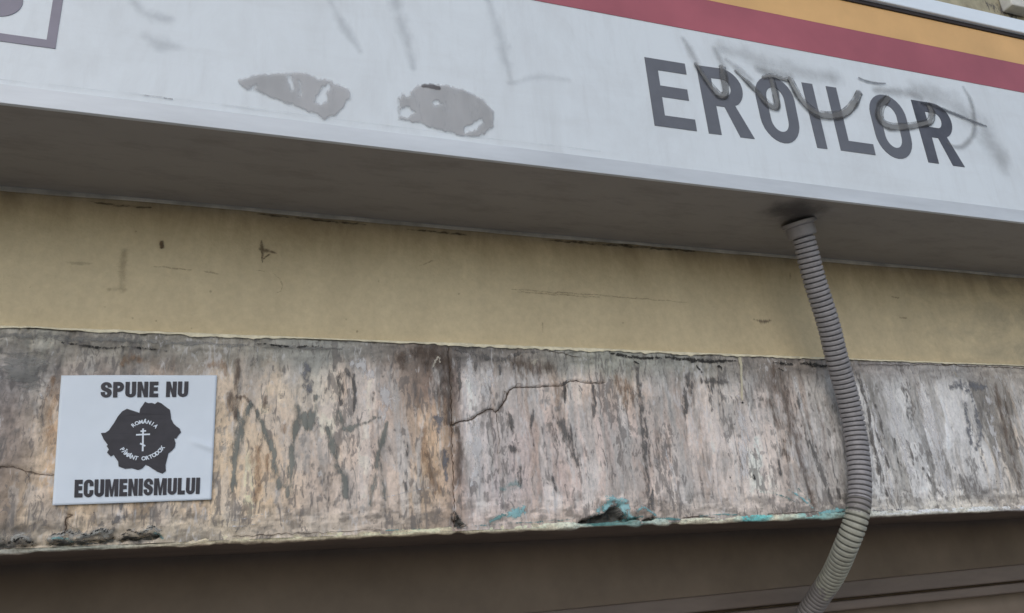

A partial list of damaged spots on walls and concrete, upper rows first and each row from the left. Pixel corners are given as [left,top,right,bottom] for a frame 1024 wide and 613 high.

water stain [228,359,249,418]
water stain [326,358,374,412]
water stain [397,347,494,486]
crack [452,350,600,454]
water stain [552,419,582,466]
water stain [636,366,654,509]
water stain [682,371,728,417]
water stain [769,366,841,505]
water stain [856,373,952,496]
water stain [949,379,1020,489]
spalling [578,496,680,524]